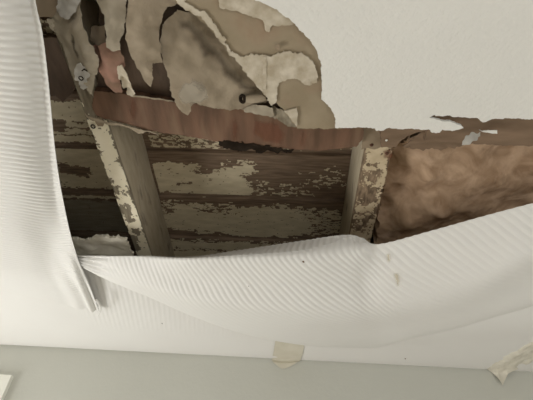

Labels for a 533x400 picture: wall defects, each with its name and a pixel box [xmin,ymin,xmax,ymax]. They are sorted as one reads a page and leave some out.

peeling [50,99,152,256]
peeling [148,131,220,149]
leakage [180,82,206,103]
leakage [182,24,240,82]
peeling [152,159,347,257]
flaking render [172,0,342,129]
peeling [350,147,392,243]
peeling [462,130,497,145]